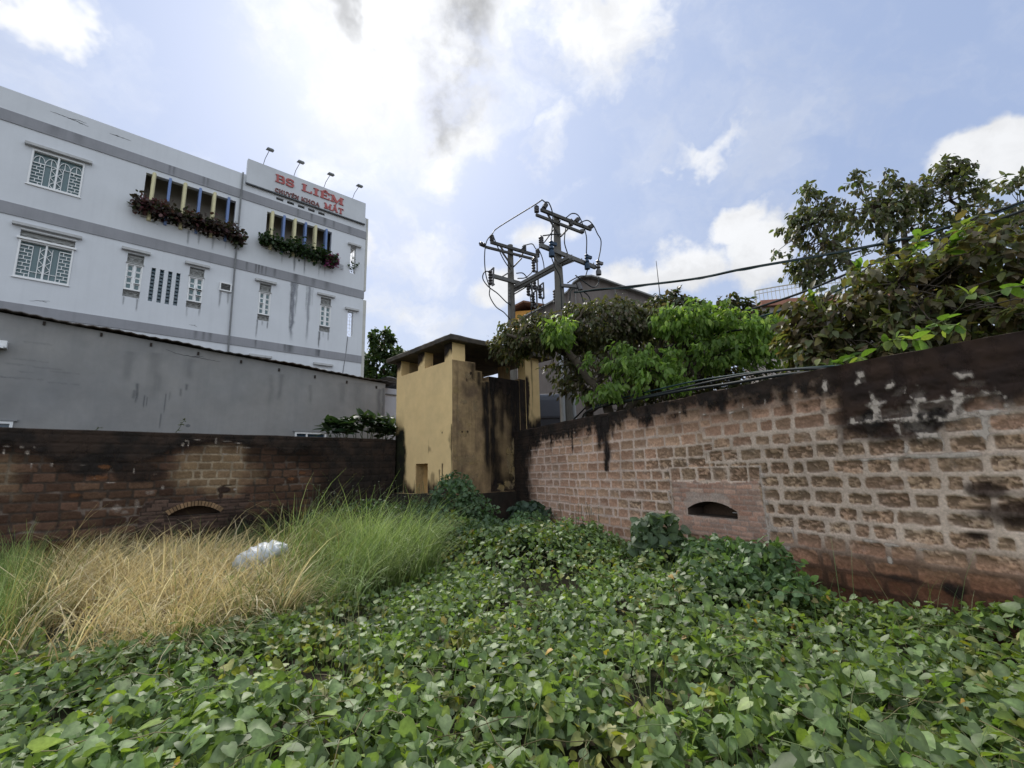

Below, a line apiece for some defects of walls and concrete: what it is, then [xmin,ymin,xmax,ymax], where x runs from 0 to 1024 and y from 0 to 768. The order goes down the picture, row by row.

water stain [472,331,1024,503]
water stain [0,424,415,544]
water stain [966,482,1024,527]
water stain [943,582,964,598]